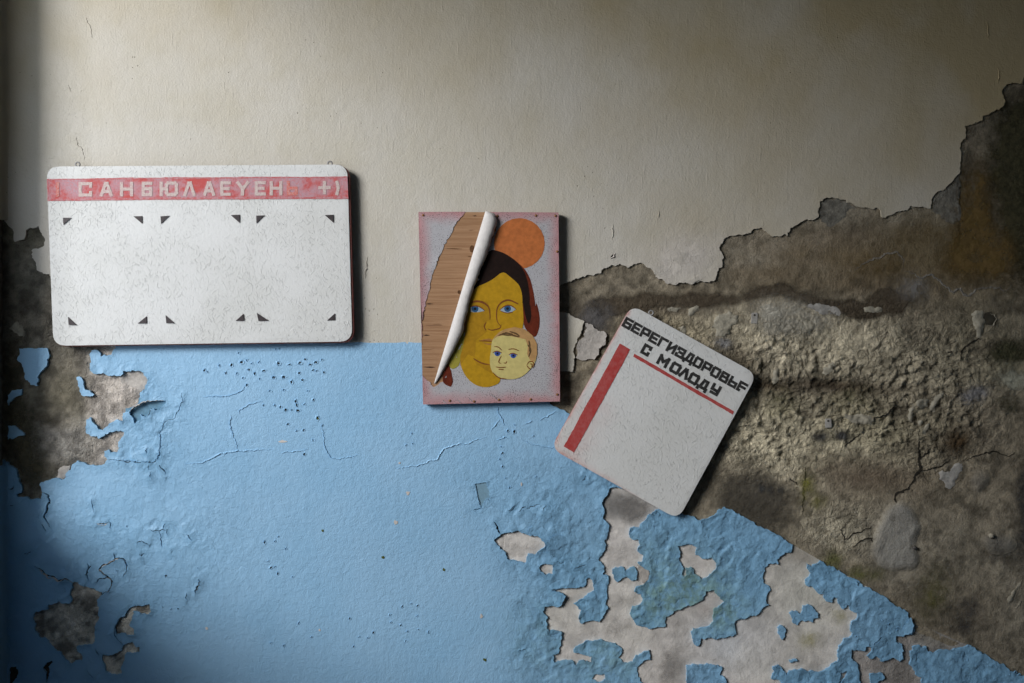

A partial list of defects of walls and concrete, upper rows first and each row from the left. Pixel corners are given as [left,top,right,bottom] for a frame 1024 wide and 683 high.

water stain [582,94,1024,336]
spalling [3,220,166,499]
spalling [543,77,1024,683]
crack [110,389,353,471]
crack [894,441,1015,503]
crack [25,529,168,594]
peeling [494,524,584,574]
peeling [34,582,102,681]
peeling [103,599,179,674]